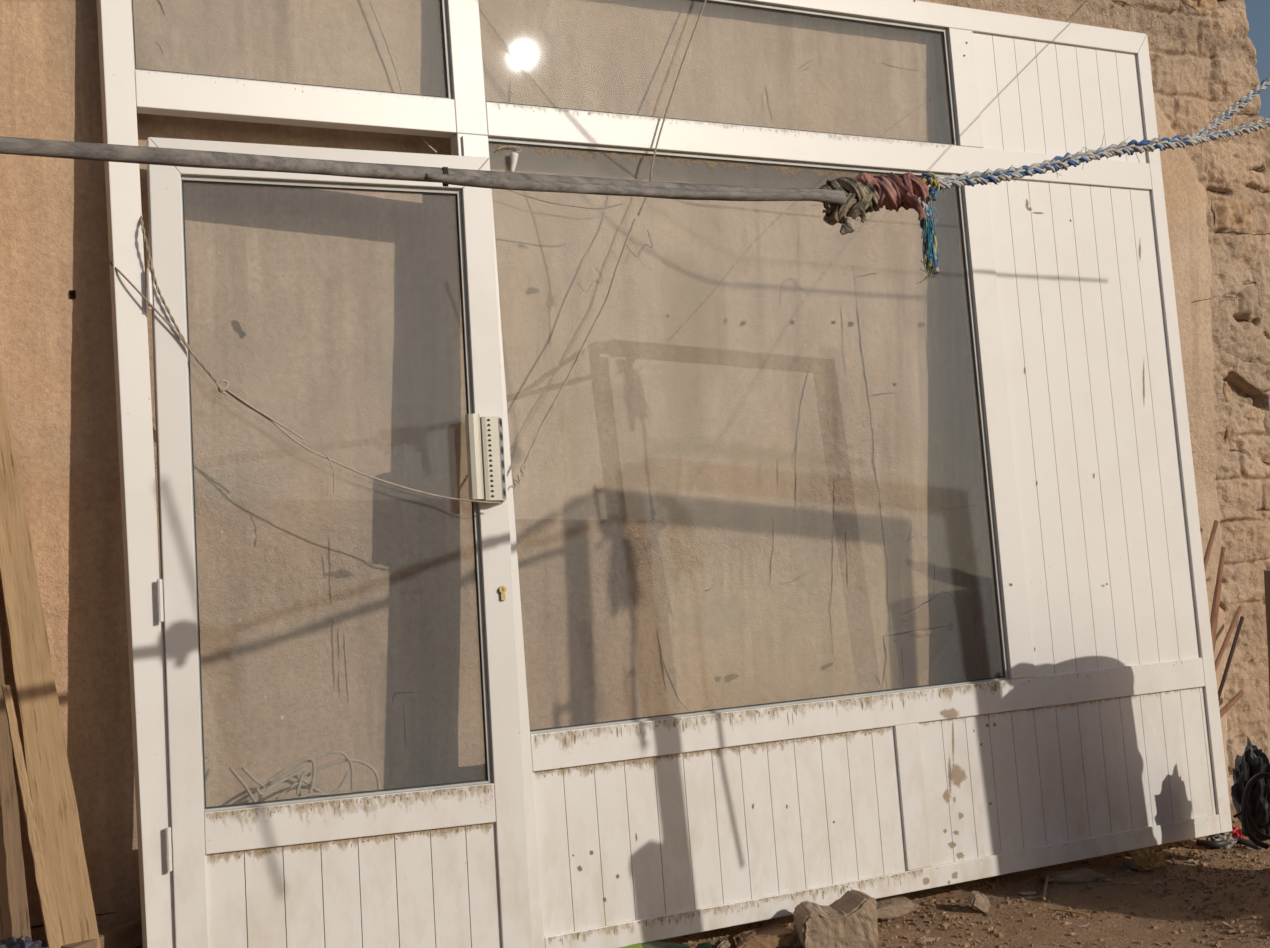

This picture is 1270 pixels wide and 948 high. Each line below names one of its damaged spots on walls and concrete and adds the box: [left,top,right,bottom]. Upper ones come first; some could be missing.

spalling [1183,0,1228,16]
spalling [1223,380,1265,443]